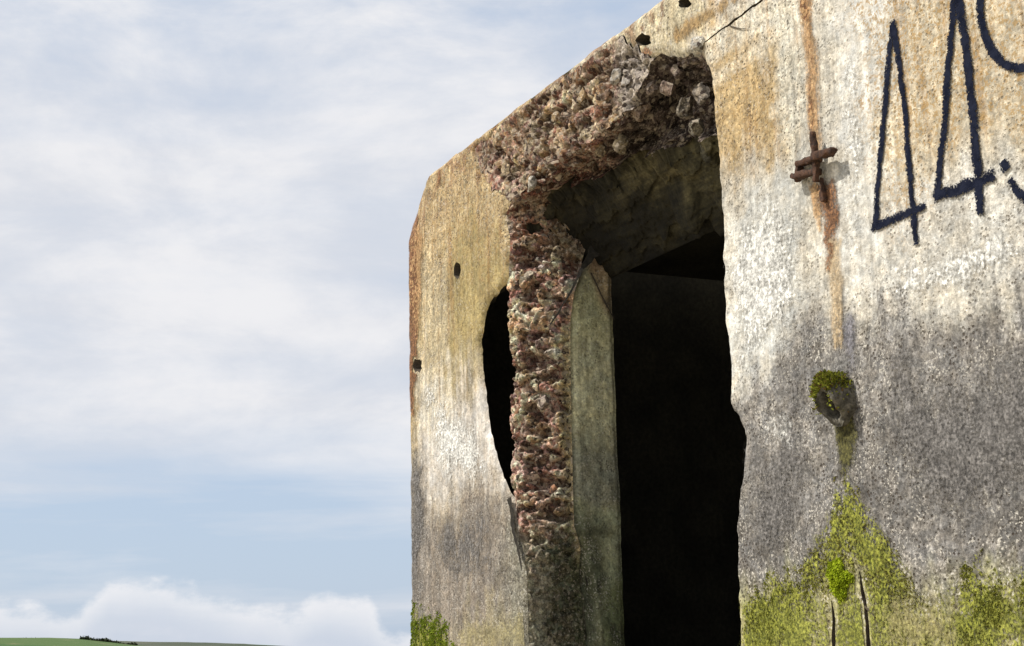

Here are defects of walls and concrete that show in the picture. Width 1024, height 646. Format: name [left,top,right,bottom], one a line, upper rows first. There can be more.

crack [705,0,763,42]
spalling [474,33,654,201]
corrosion [409,215,424,416]
crack [829,601,837,646]
crack [859,571,877,646]